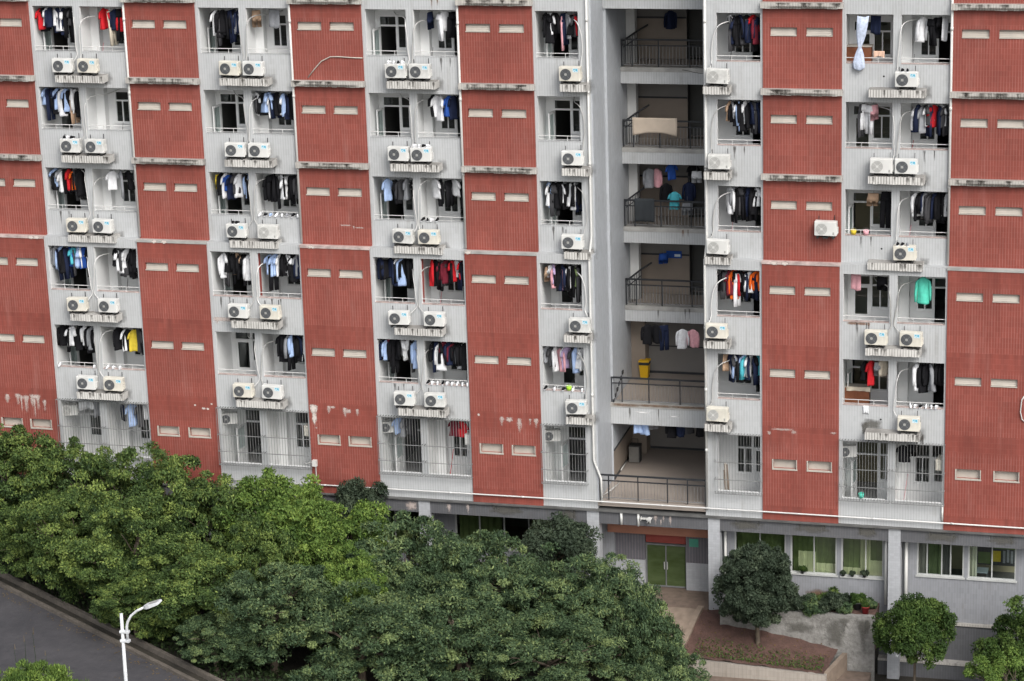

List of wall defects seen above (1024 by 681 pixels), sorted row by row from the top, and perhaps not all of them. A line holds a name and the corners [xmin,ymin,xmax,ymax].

peeling [310,405,358,423]